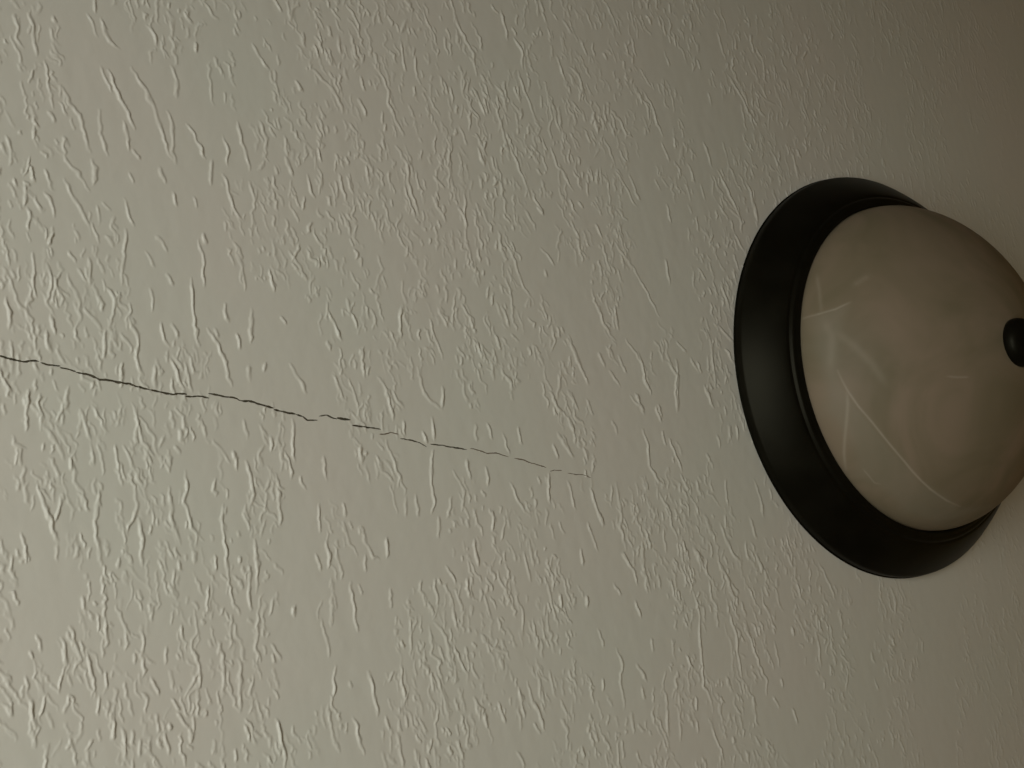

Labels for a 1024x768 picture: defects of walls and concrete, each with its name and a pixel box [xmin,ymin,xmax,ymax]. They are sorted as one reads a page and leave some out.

crack [0,355,591,478]